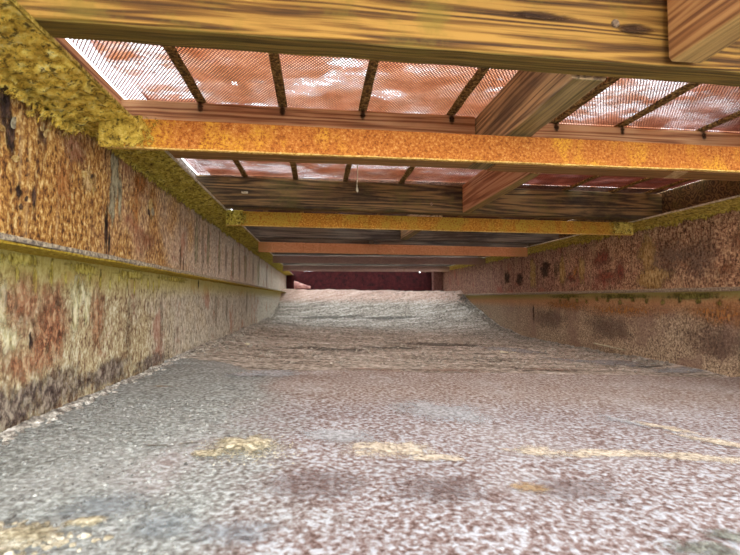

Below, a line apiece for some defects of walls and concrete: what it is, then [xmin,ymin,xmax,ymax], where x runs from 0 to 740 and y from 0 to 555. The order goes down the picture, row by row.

corrosion [104,146,740,173]
leakage [104,152,122,254]
corrosion [226,225,632,236]
corrosion [7,278,67,380]
leakage [0,358,127,432]
leakage [136,353,165,371]